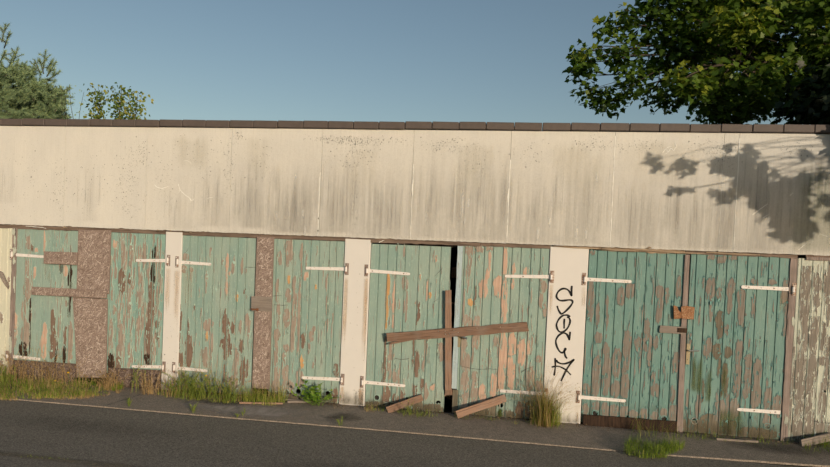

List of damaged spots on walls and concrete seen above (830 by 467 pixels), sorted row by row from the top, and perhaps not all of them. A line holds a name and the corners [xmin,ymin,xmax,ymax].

peeling [7,226,70,350]
peeling [39,264,74,363]
peeling [107,229,165,368]
peeling [179,247,253,392]
peeling [270,239,342,403]
peeling [365,250,450,412]
peeling [581,247,830,442]